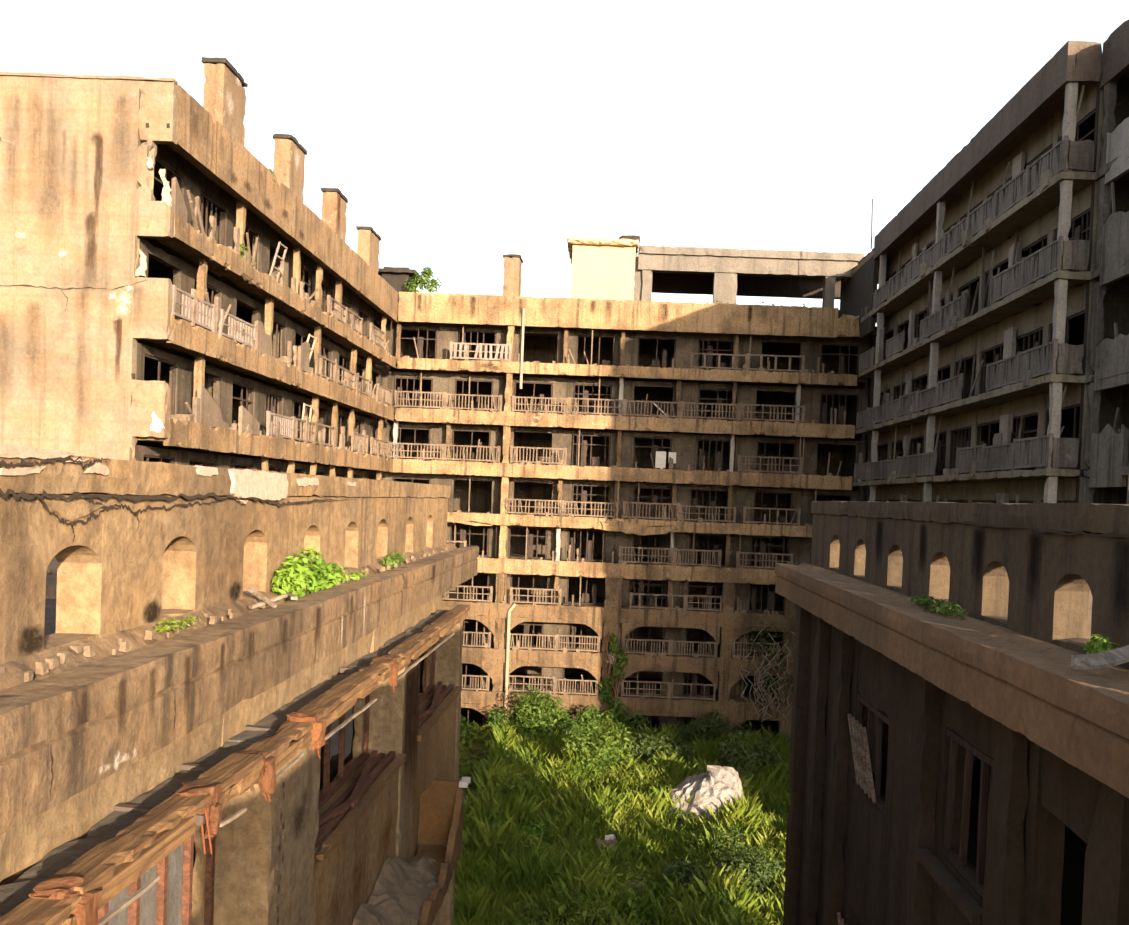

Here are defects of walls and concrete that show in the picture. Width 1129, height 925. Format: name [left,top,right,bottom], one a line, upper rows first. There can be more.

damp [87,134,102,267]
crack [0,280,145,310]
crack [0,456,356,541]
peeling [194,465,319,504]